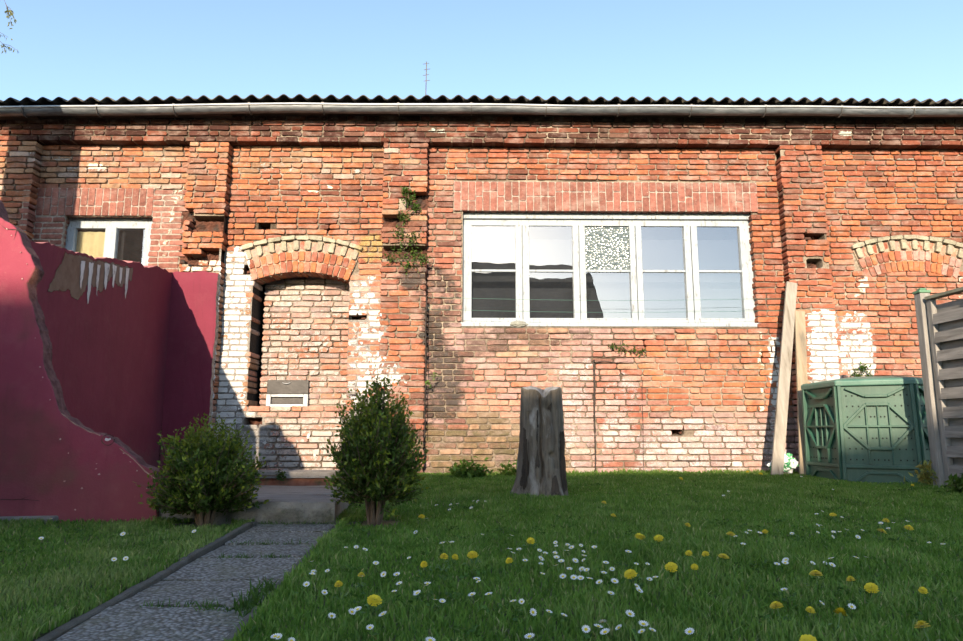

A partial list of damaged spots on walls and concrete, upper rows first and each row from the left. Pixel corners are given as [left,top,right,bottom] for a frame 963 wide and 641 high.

peeling [178,246,408,470]
peeling [805,309,876,383]